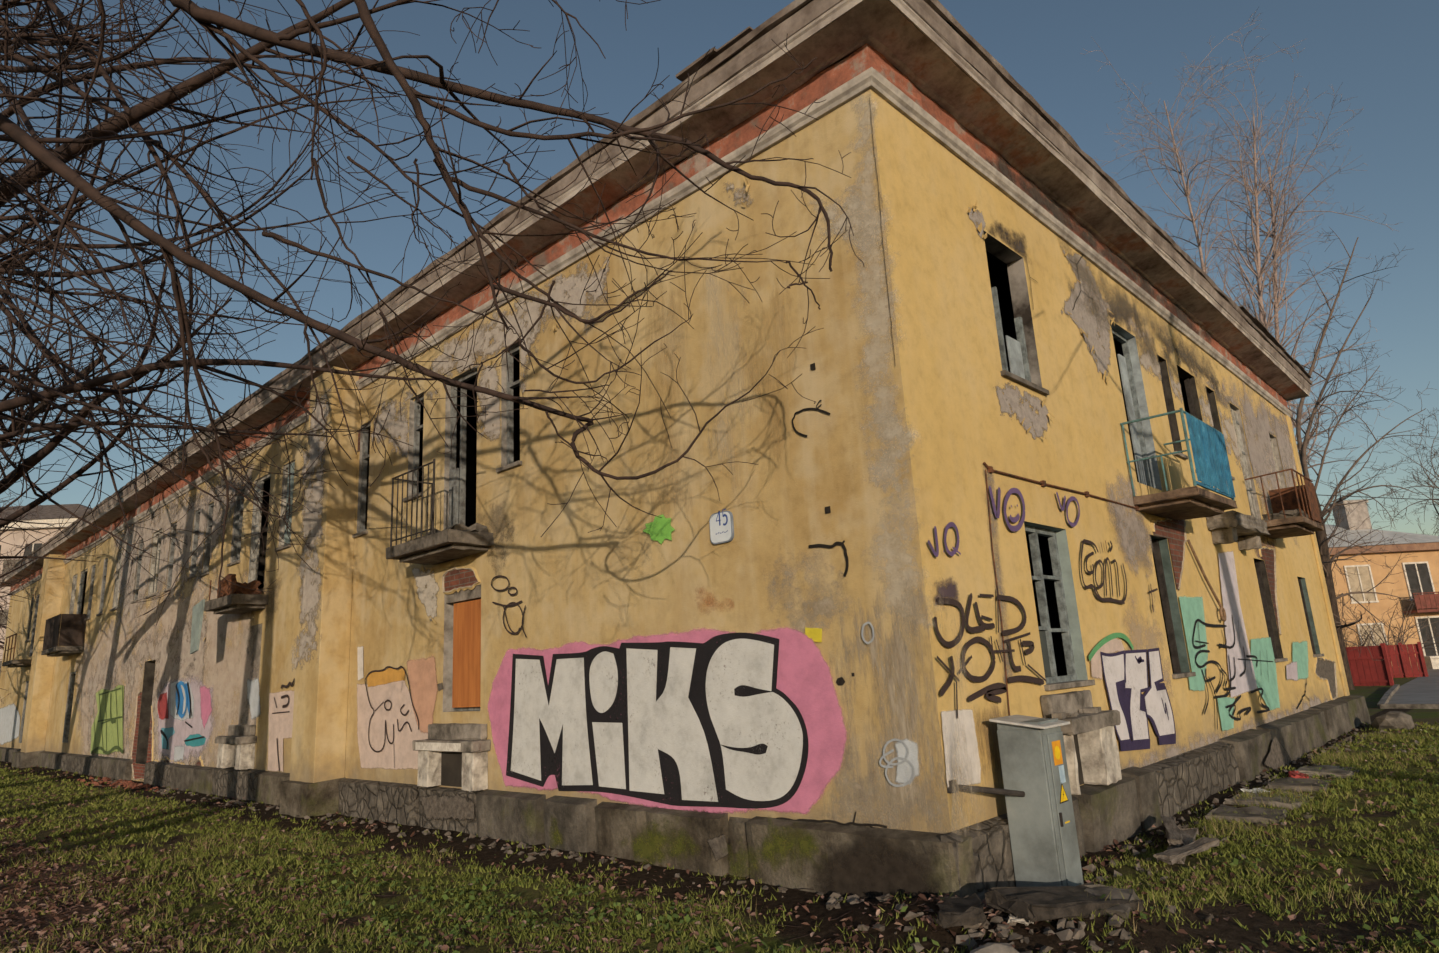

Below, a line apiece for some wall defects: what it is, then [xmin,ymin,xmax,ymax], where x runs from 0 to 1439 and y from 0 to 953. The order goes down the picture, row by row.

flaking render [968,200,988,239]
peeling [428,258,609,440]
flaking render [1060,245,1115,385]
peeling [356,386,437,457]
flaking render [993,382,1055,439]
peeling [292,389,331,669]
flaking render [412,565,481,625]